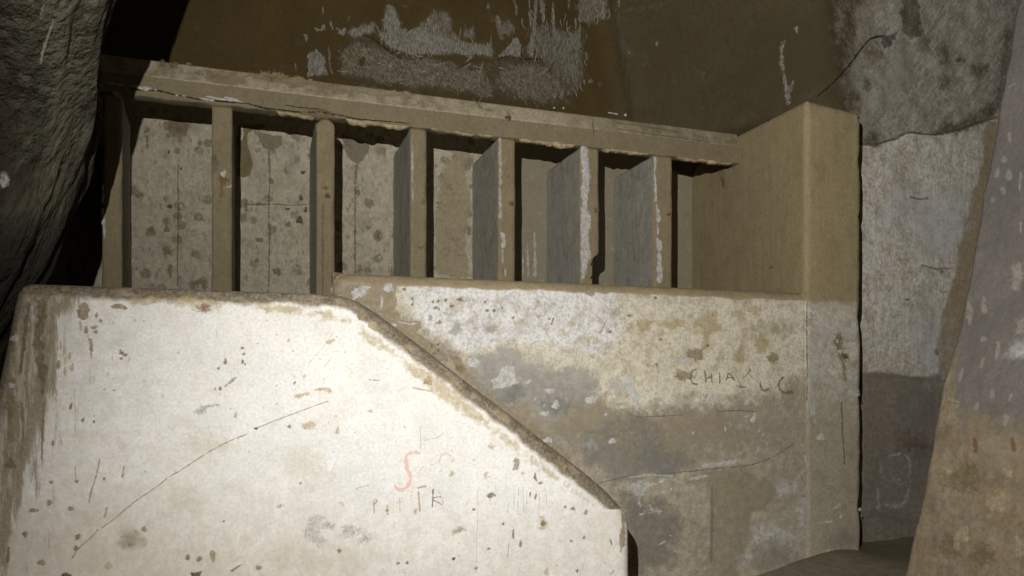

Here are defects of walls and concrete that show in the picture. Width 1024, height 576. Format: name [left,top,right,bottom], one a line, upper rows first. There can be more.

crack [129,87,409,124]
spalling [307,31,573,109]
crack [816,33,897,97]
damp [5,297,74,468]